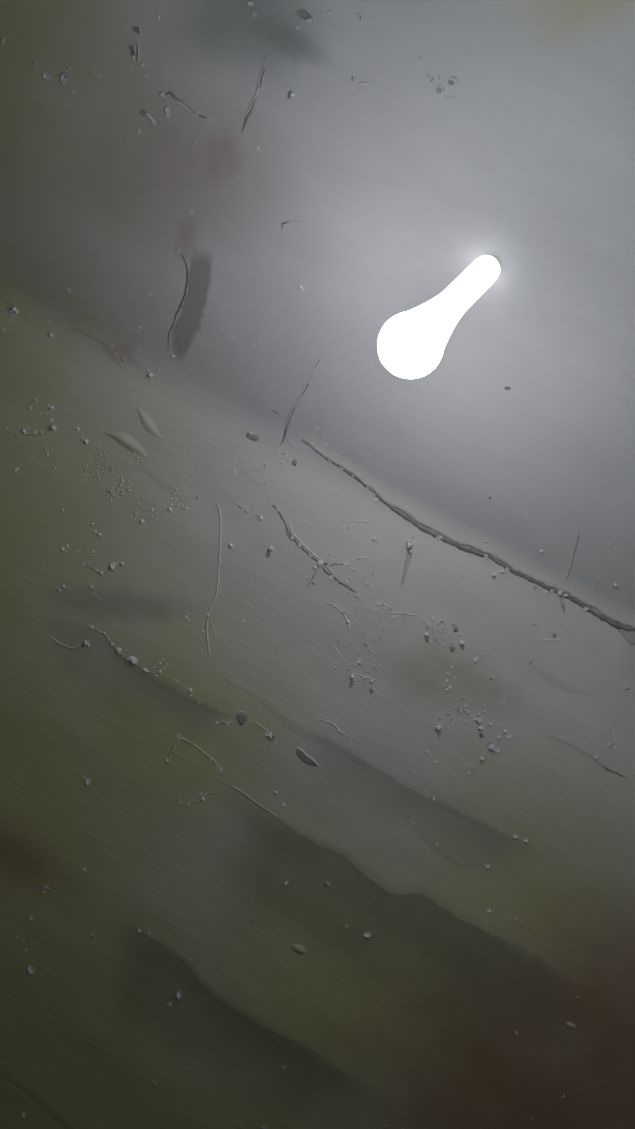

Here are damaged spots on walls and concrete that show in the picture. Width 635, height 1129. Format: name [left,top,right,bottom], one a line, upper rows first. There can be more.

crack [185,502,222,657]
crack [271,356,635,646]